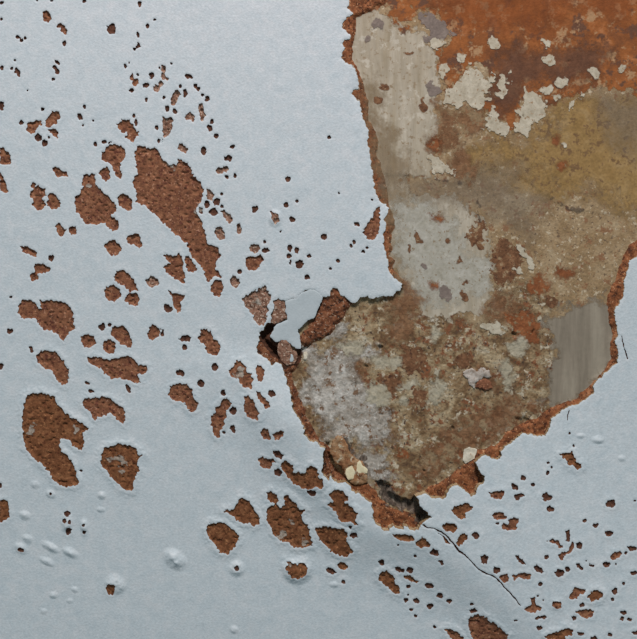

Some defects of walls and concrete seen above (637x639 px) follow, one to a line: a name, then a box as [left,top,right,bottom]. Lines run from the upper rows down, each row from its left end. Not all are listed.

corrosion [374,84,389,104]
corrosion [384,0,637,185]
spalling [74,62,270,297]
spalling [17,299,75,341]
spalling [81,323,147,393]
spalling [224,0,637,574]
spalling [22,392,89,488]
spalling [100,443,142,491]
spalling [206,522,239,555]
crack [423,524,521,606]